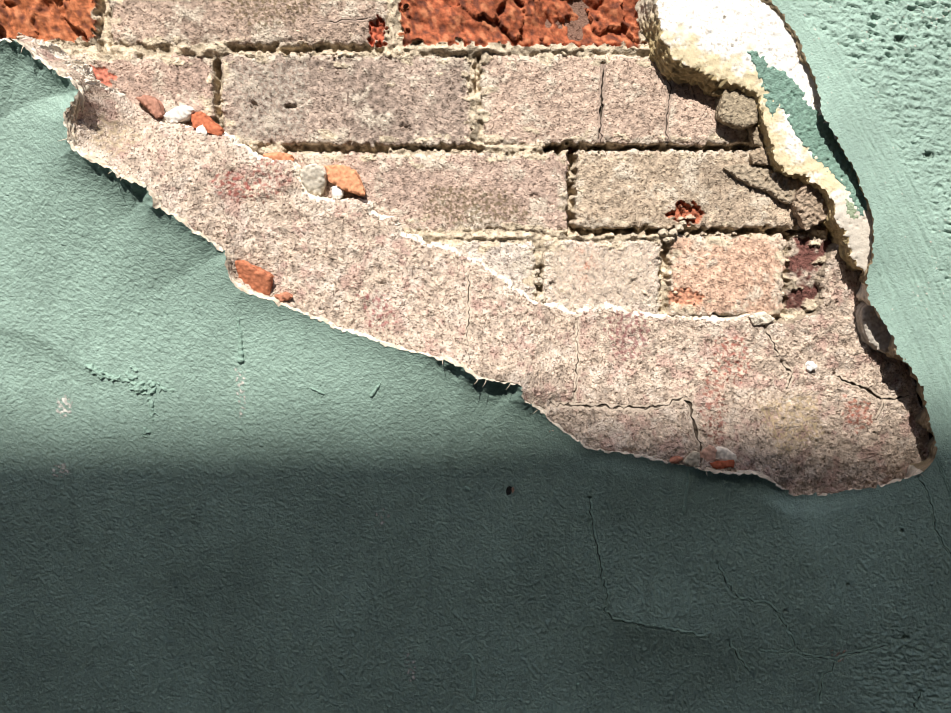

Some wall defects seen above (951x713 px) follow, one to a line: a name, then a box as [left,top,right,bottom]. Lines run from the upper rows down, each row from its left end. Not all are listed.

spalling [0,0,937,496]
crack [587,498,708,640]
crack [916,458,951,557]